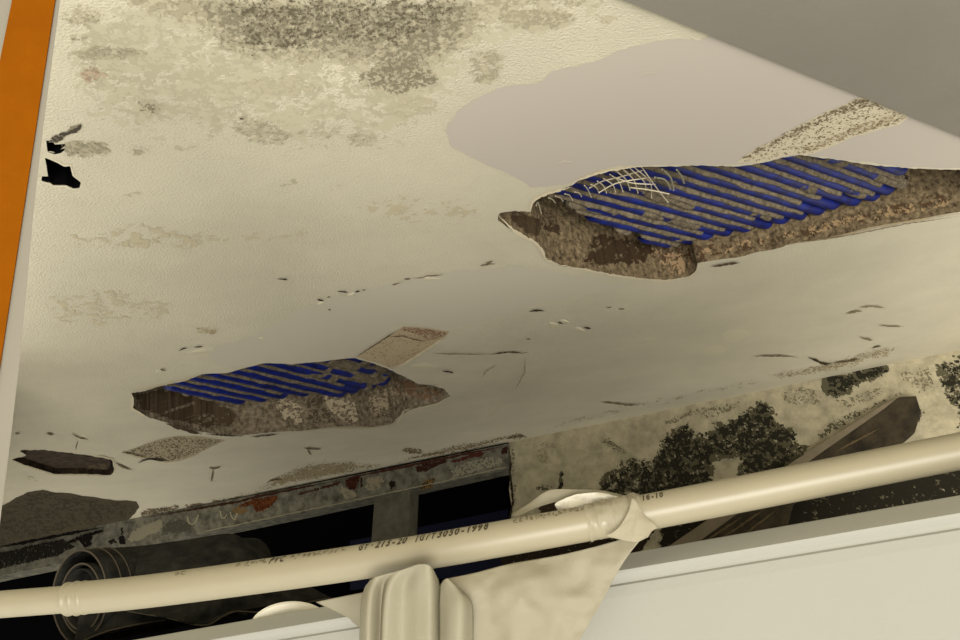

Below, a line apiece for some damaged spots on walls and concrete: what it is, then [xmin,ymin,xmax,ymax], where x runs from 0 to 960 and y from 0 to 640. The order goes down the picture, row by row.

water stain [61,0,617,156]
hole [41,141,81,190]
spalling [498,99,960,282]
spalling [126,327,450,462]
water stain [773,347,901,439]
mould [901,355,960,428]
spalling [12,450,116,476]
rust [298,475,363,495]
rust [415,452,484,490]
water stain [599,396,810,495]